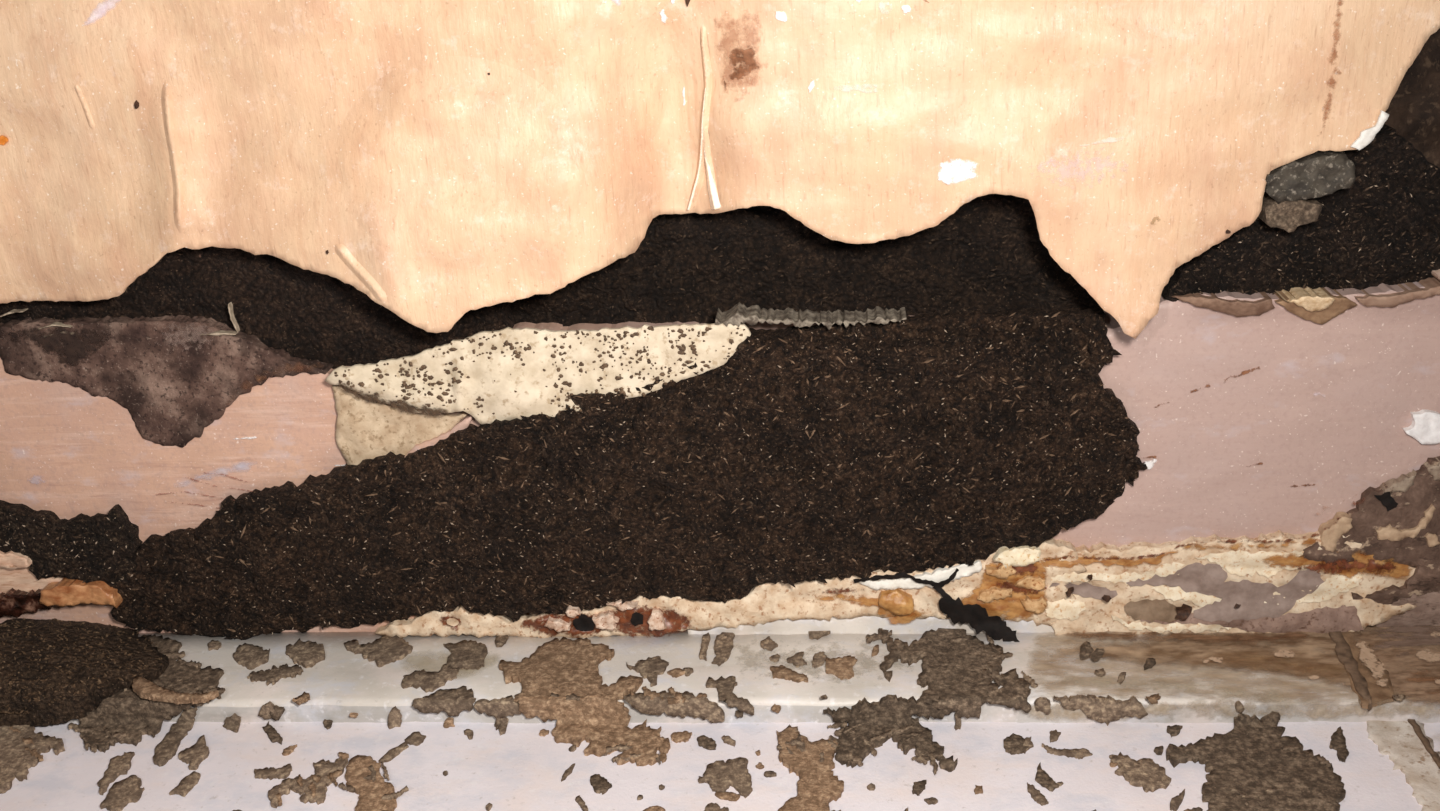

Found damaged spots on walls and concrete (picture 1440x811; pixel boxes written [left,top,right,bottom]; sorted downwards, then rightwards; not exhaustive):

spalling [1172,269,1440,324]
peeling [405,414,473,457]
peeling [991,456,1440,636]
peeling [0,567,64,593]
peeling [247,638,325,686]
peeling [344,551,1000,723]